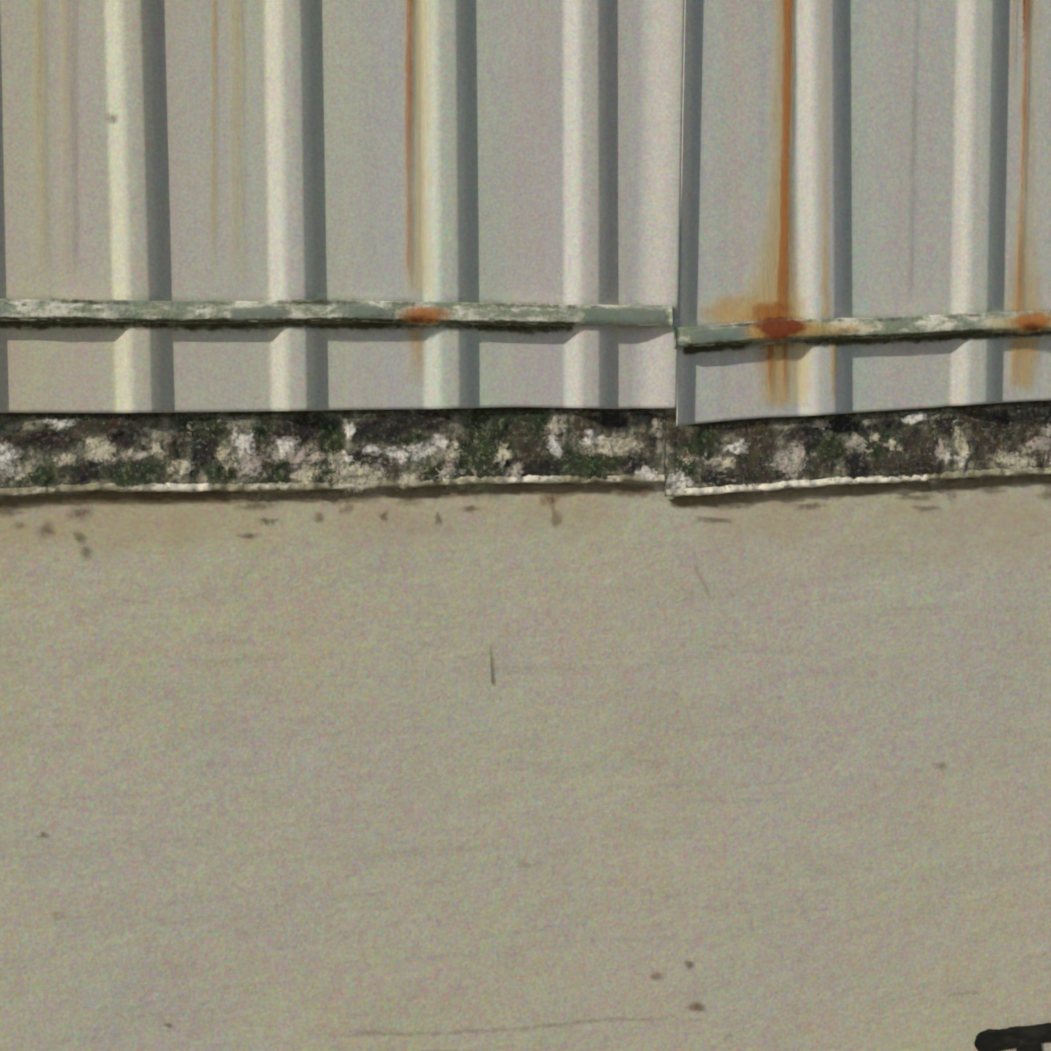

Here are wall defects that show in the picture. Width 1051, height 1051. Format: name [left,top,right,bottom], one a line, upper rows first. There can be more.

rust [716,0,827,393]
rust [405,307,447,323]
rust [1009,222,1051,380]
leakage [0,404,1051,515]